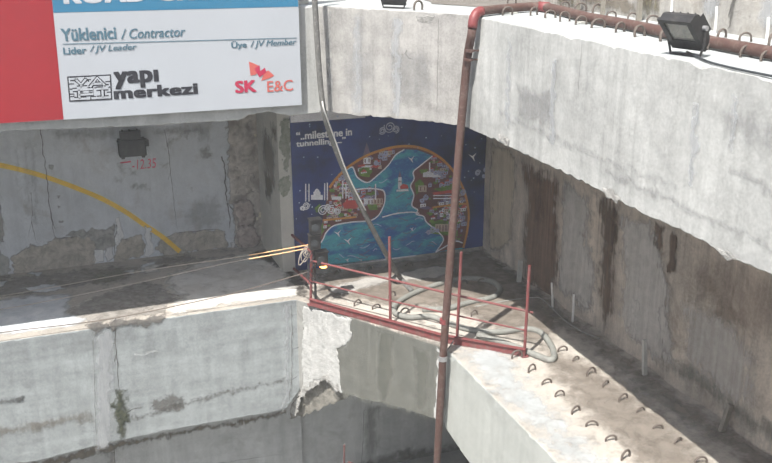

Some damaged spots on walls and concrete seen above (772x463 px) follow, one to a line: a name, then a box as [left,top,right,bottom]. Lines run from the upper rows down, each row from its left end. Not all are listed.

water stain [586,0,646,14]
crack [727,0,735,28]
crack [16,130,73,255]
spalling [0,114,263,276]
crack [111,317,120,392]
water stain [0,217,307,463]
flaking render [290,306,352,419]
water stain [317,143,772,463]